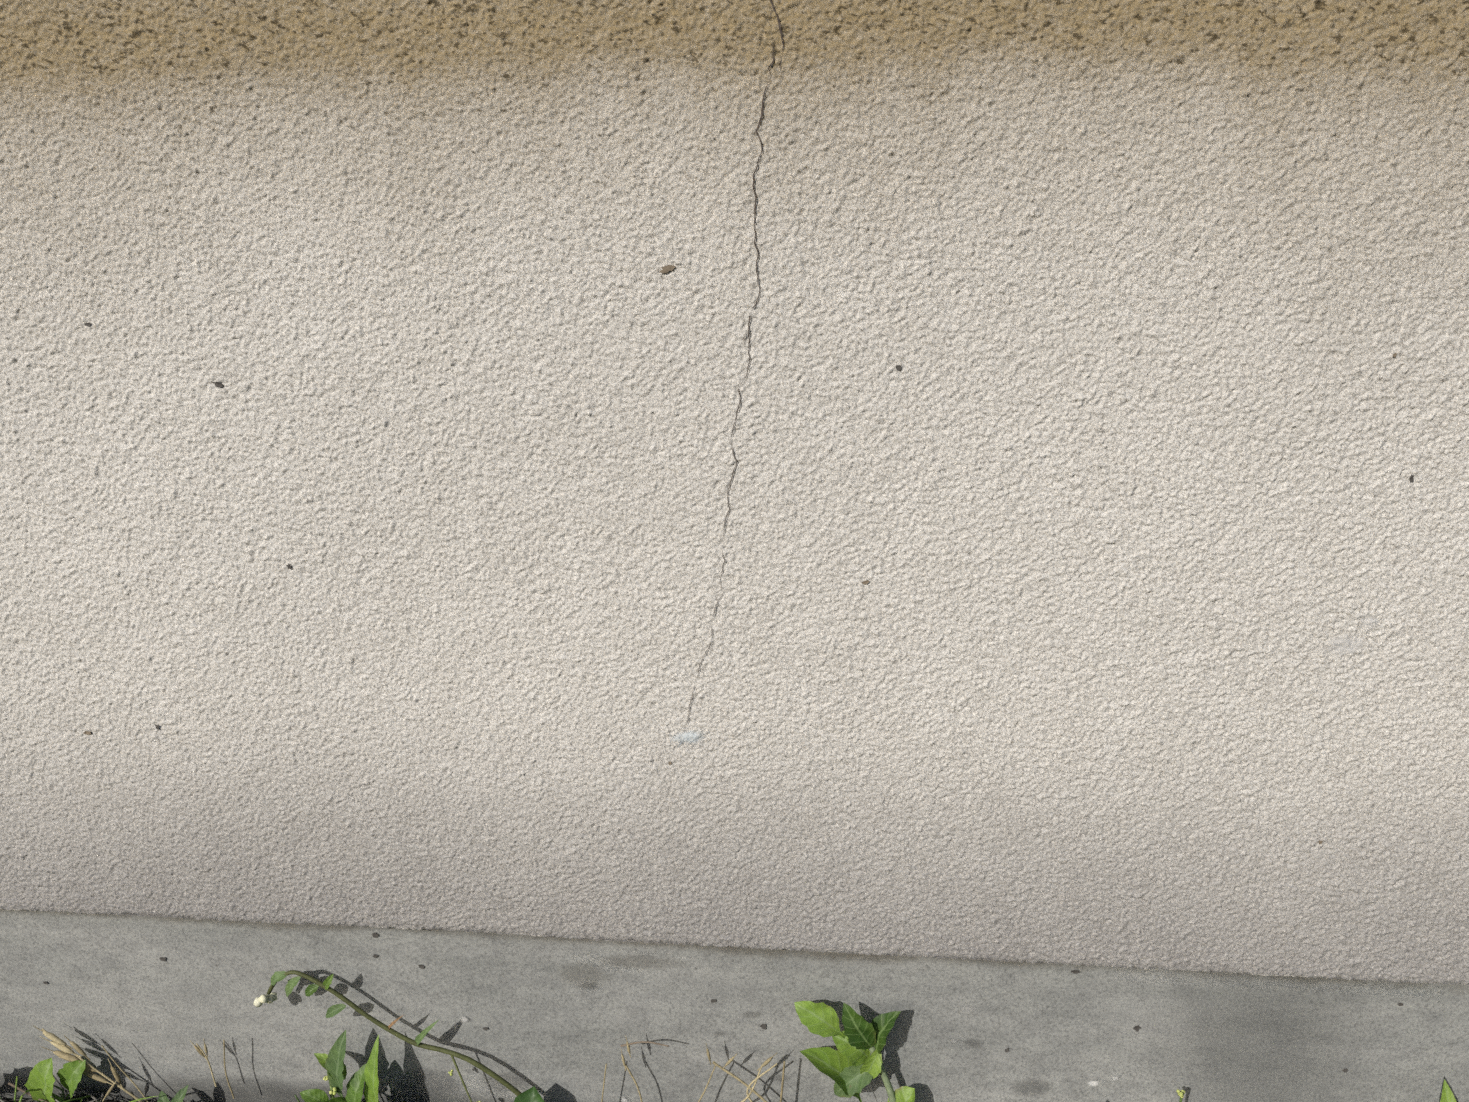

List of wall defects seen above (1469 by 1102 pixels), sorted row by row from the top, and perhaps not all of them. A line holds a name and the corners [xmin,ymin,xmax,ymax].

leakage [0,0,1469,113]
crack [686,0,787,732]